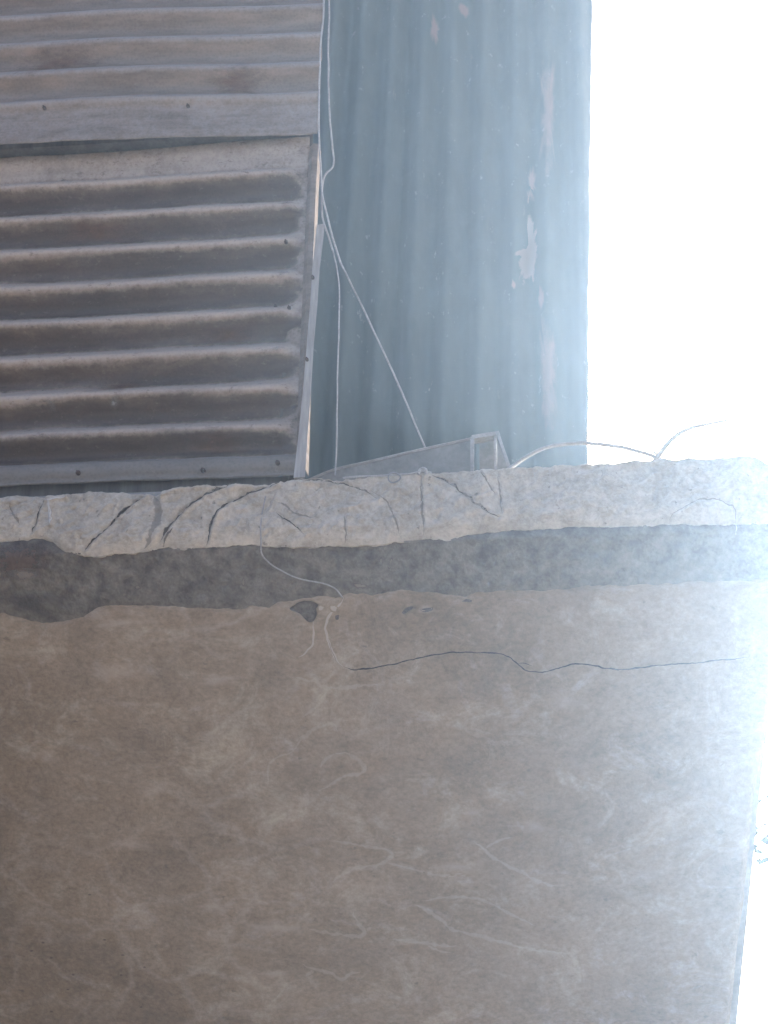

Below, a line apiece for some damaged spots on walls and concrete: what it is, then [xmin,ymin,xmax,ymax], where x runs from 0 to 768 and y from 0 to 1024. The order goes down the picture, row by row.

crack [9,500,44,532]
crack [85,472,502,550]
spalling [0,523,768,623]
crack [295,596,744,718]